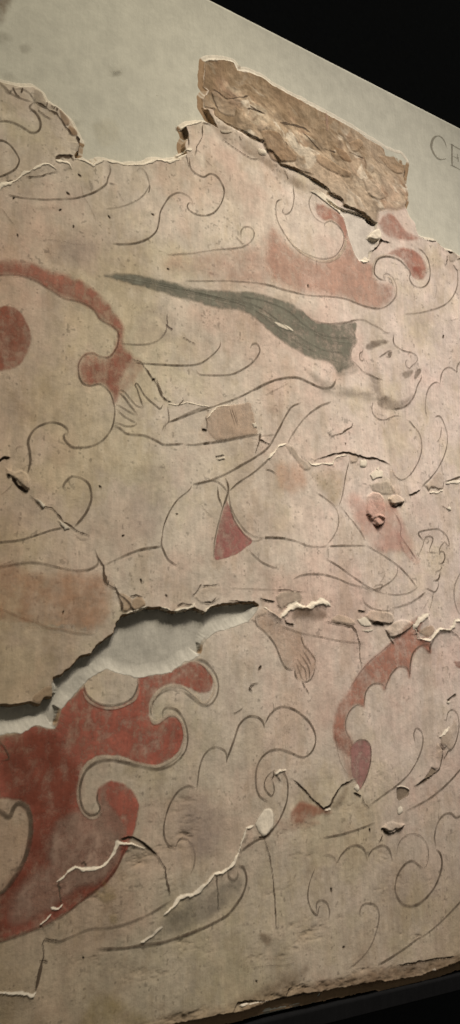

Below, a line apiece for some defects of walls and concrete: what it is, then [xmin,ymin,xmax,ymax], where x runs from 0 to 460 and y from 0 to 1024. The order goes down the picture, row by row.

crack [221,120,371,221]
crack [310,424,388,467]
crack [0,456,145,612]
flaking render [0,584,275,735]
crack [295,780,369,811]
flaking render [227,808,276,913]
crack [0,836,228,998]